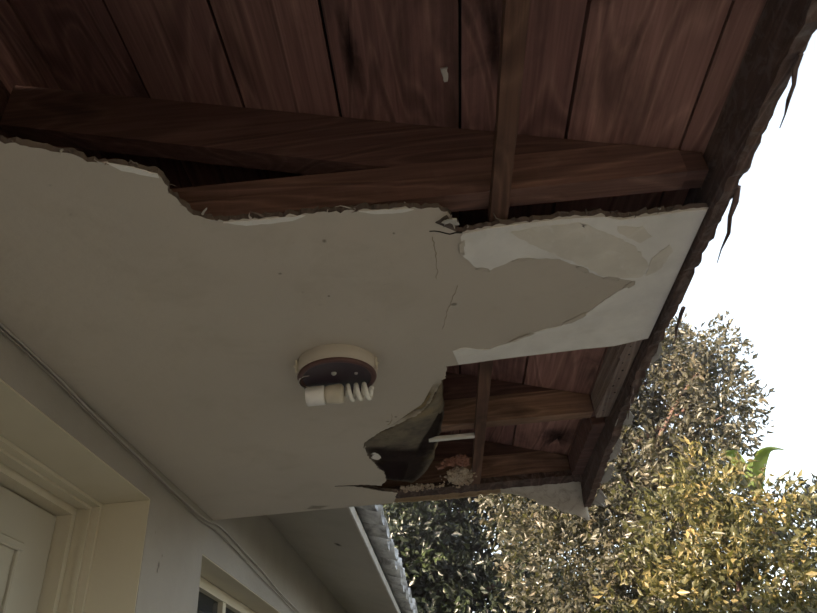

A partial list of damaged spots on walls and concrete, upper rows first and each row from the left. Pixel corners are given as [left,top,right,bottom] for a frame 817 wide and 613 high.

flaking render [107,162,159,178]
flaking render [223,215,305,226]
crack [429,215,462,279]
peeling [453,209,707,365]
flaking render [376,438,622,520]